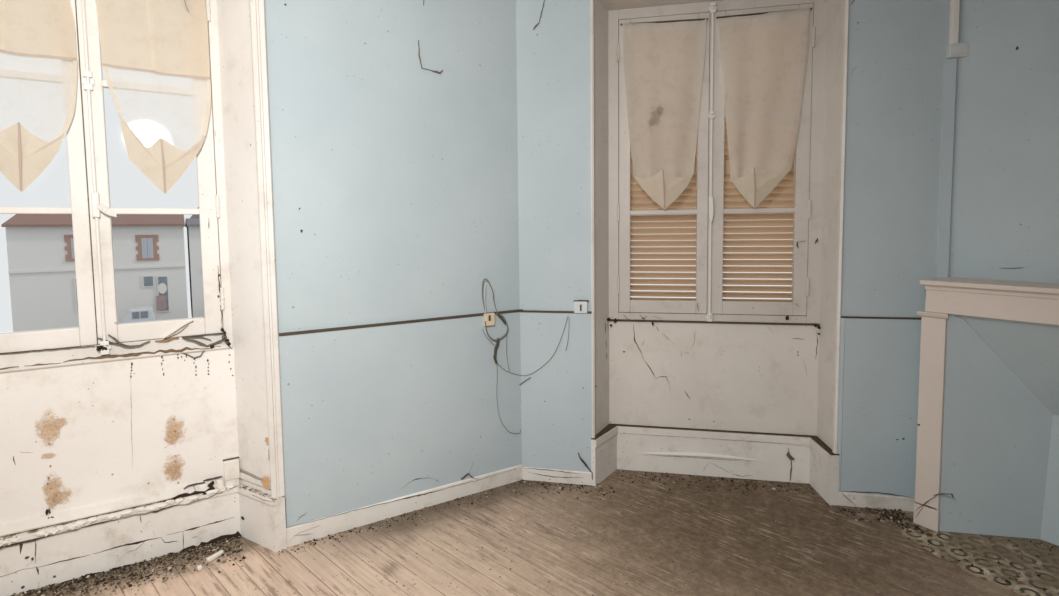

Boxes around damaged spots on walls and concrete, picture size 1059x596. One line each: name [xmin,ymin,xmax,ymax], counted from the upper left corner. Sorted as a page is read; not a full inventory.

crack [623,314,695,398]
crack [0,508,233,589]
peeling [0,484,234,549]
crack [164,469,273,502]
crack [287,468,581,528]